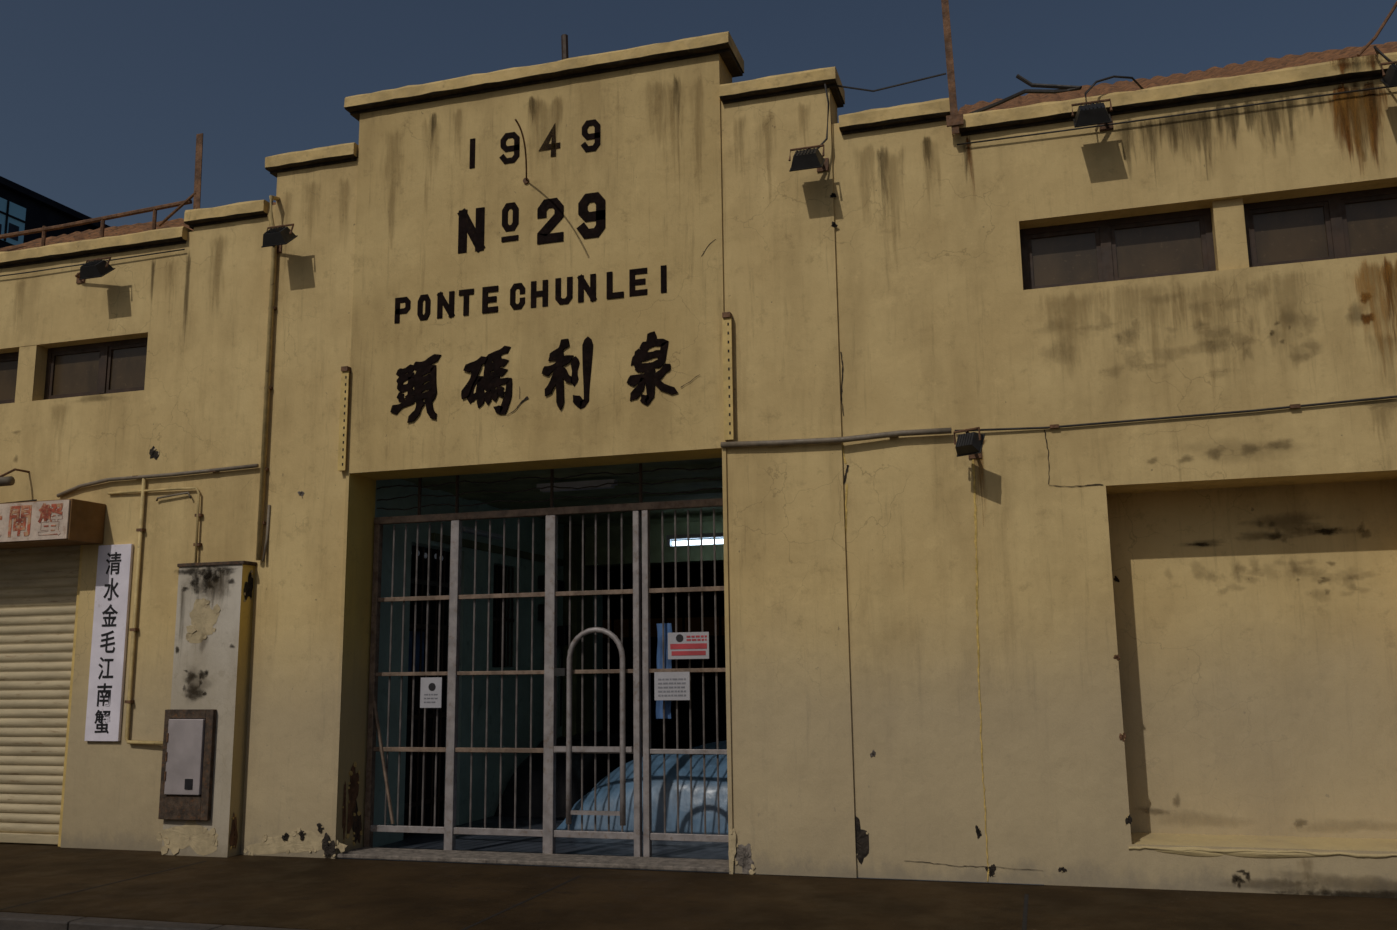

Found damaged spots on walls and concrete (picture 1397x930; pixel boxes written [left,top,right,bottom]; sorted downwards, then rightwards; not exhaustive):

rust [1358,259,1397,333]
crack [1044,430,1103,487]
peeling [186,598,221,643]
spalling [855,816,869,865]